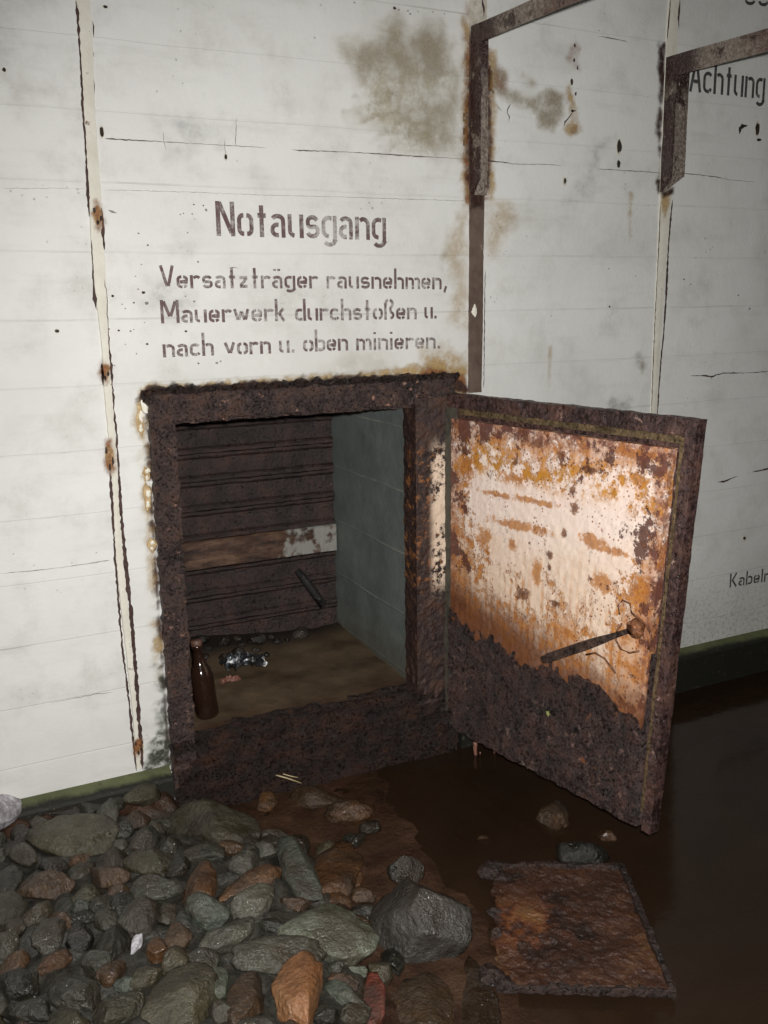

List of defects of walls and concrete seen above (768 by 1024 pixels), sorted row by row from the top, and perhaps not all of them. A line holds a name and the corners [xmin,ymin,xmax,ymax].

rust [463,23,496,207]
rust [656,44,666,151]
rust [656,179,673,213]
rust [138,356,468,760]
rust [446,607,656,816]